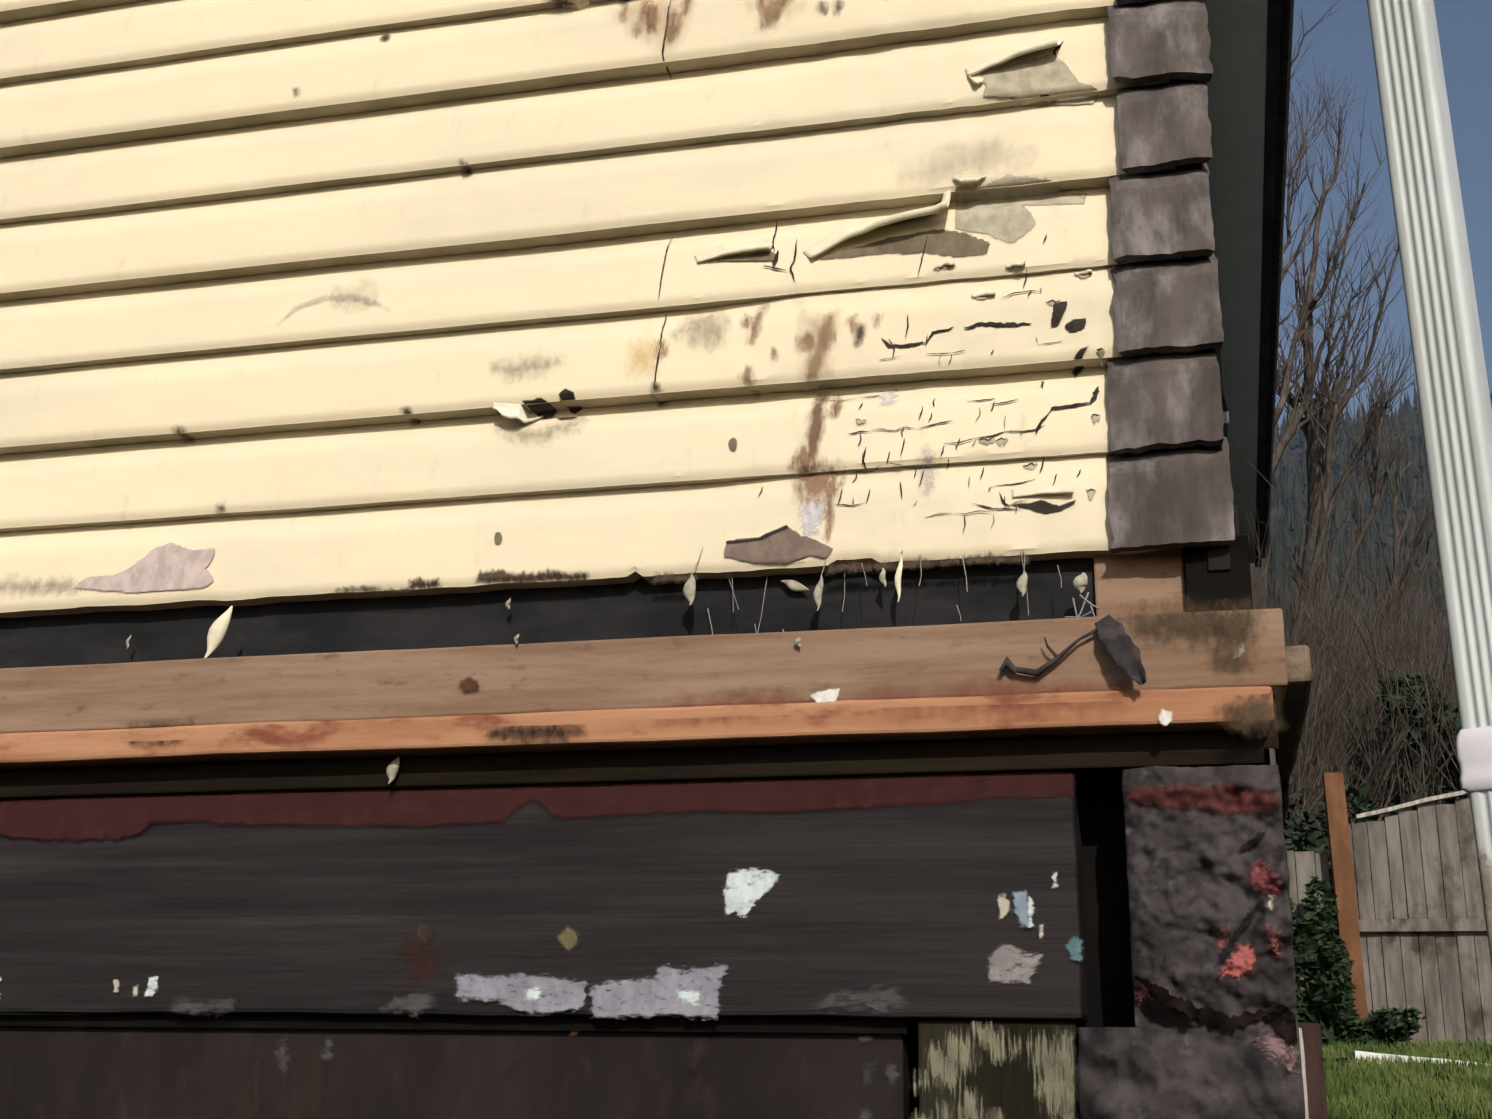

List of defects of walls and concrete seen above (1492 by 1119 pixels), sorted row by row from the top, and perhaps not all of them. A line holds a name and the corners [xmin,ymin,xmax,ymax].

corrosion [621,0,690,77]
corrosion [759,0,788,28]
peeling [965,37,1098,106]
peeling [694,175,1087,281]
corrosion [744,312,762,342]
corrosion [801,316,864,377]
crack [828,234,1100,532]
corrosion [792,395,842,537]
spalling [724,498,1029,574]
spalling [723,868,779,916]
spalling [988,891,1043,984]
spalling [454,965,728,1021]